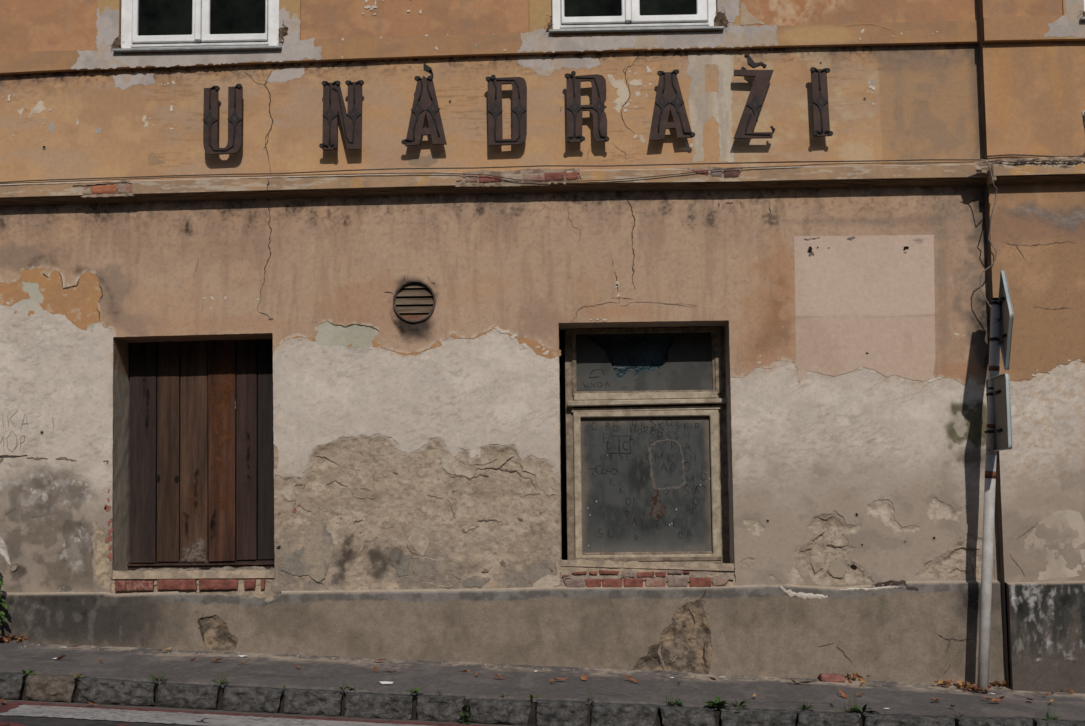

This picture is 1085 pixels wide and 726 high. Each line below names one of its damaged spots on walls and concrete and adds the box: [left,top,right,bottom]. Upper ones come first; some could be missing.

spalling [277,21,289,44]
crack [244,71,273,320]
crack [571,195,699,322]
peeling [0,268,1085,674]
damp [948,401,987,463]
damp [1011,588,1077,610]